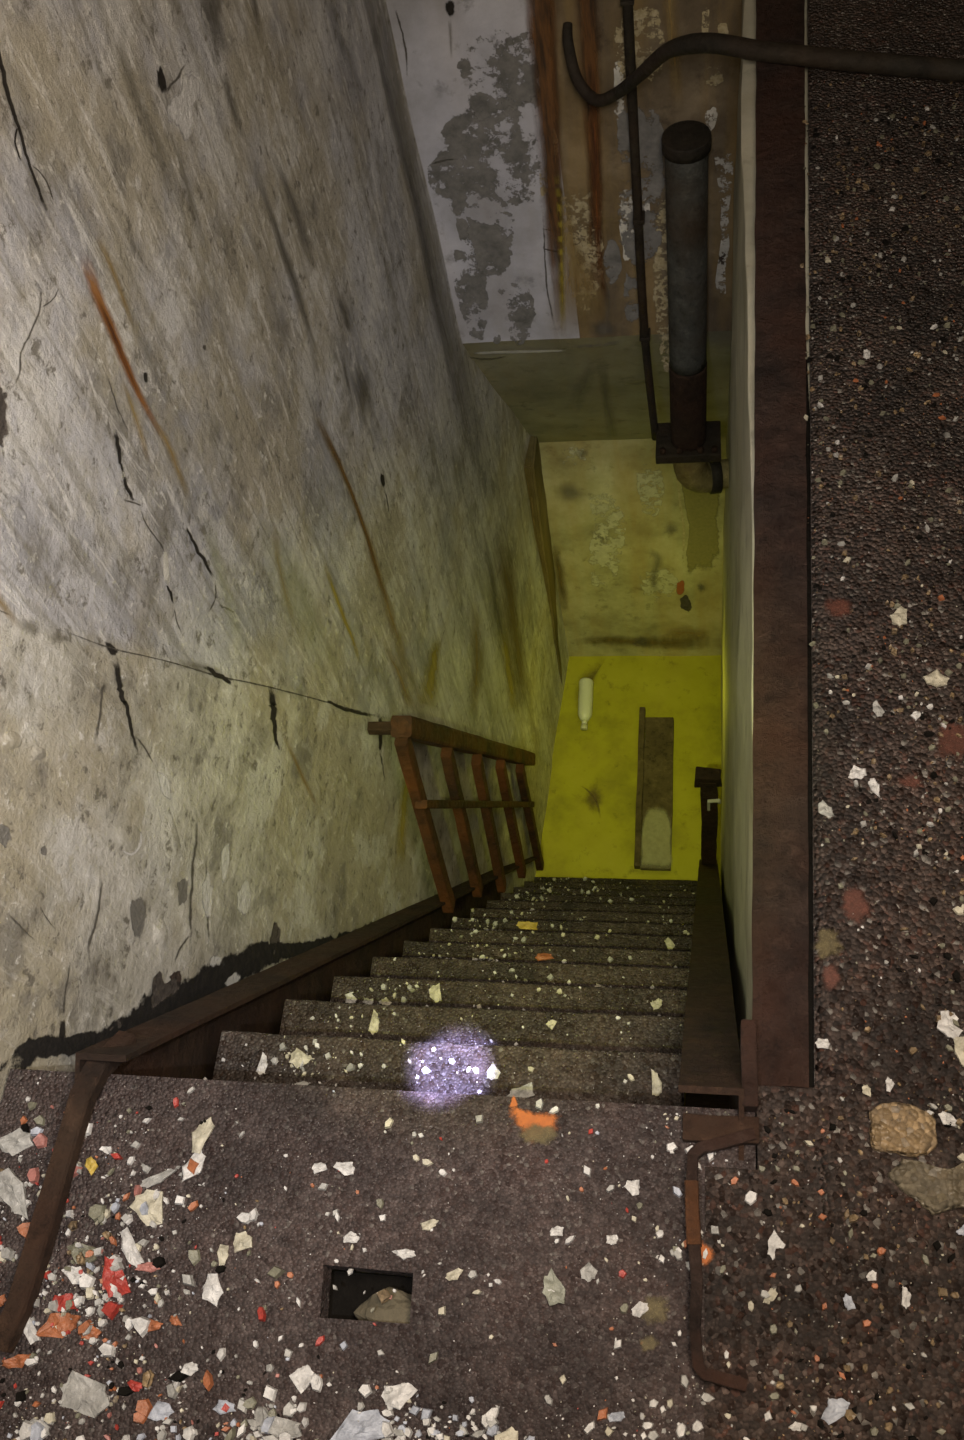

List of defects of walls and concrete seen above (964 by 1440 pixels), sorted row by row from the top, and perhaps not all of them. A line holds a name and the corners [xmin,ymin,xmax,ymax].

crack [0,52,53,209]
rust [529,0,562,267]
peeling [427,7,669,372]
rust [578,0,604,285]
spalling [0,387,9,447]
rust [87,275,150,440]
crack [78,381,385,792]
peeling [589,495,626,587]